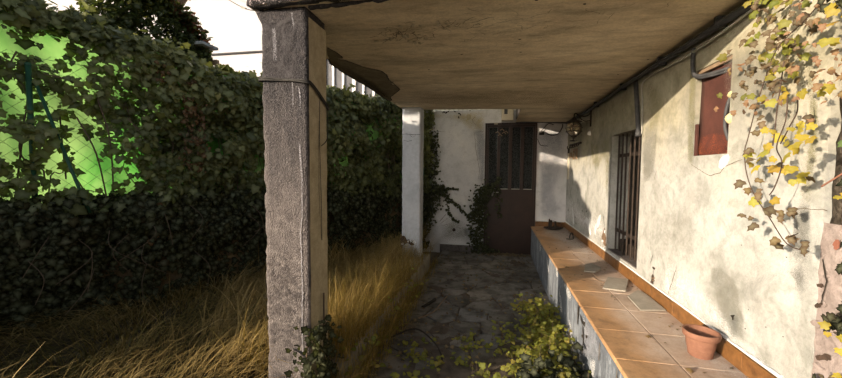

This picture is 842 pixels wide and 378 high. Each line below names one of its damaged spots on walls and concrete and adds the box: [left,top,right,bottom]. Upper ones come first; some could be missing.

peeling [327,47,400,101]